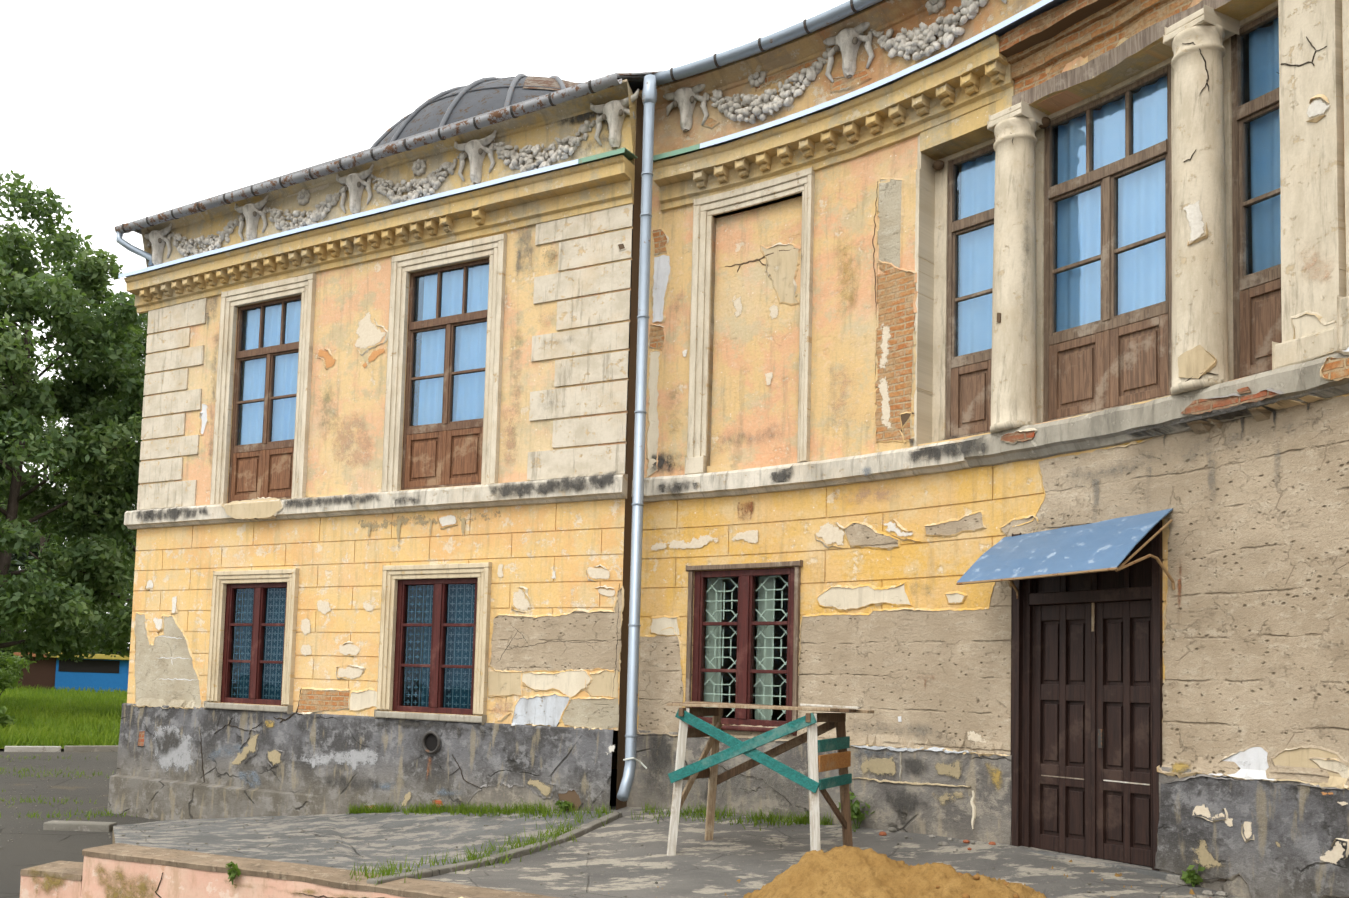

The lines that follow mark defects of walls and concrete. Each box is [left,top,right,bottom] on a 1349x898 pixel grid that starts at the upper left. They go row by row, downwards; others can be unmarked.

crack [1182,42,1209,93]
crack [1277,37,1327,74]
crack [728,248,795,272]
peeling [355,312,388,368]
flaking render [874,178,918,443]
water stain [358,499,438,548]
flaking render [133,597,204,710]
crack [200,688,303,784]
flaking render [488,564,624,730]
peeling [650,615,681,637]
flaking render [692,581,1011,805]
flaking render [815,345,1349,898]